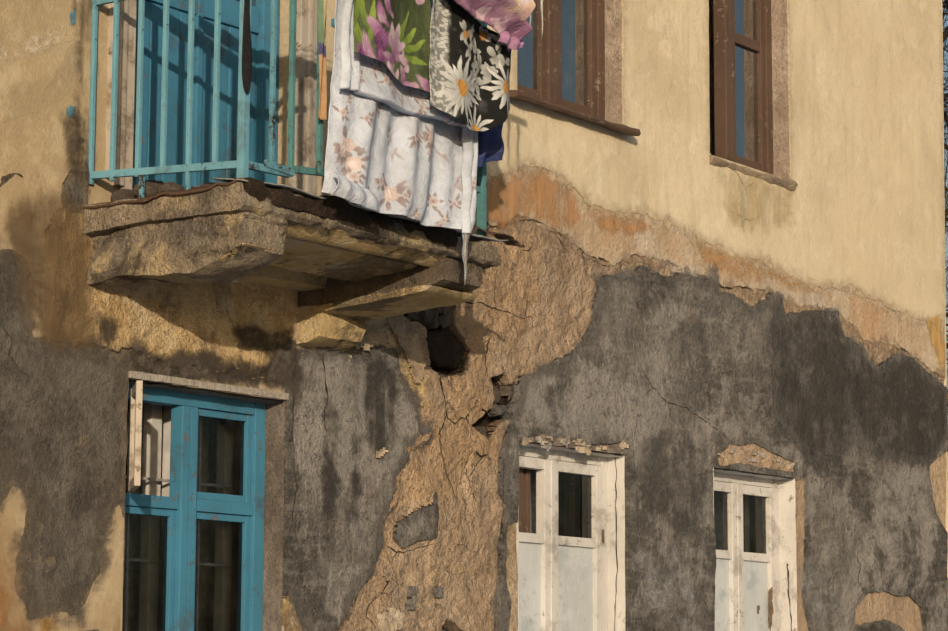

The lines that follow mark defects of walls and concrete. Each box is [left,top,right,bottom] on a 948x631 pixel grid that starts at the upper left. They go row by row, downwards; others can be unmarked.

leakage [63,117,81,172]
leakage [10,199,117,346]
crack [387,378,504,631]
spalling [41,166,947,631]
crack [614,371,730,630]